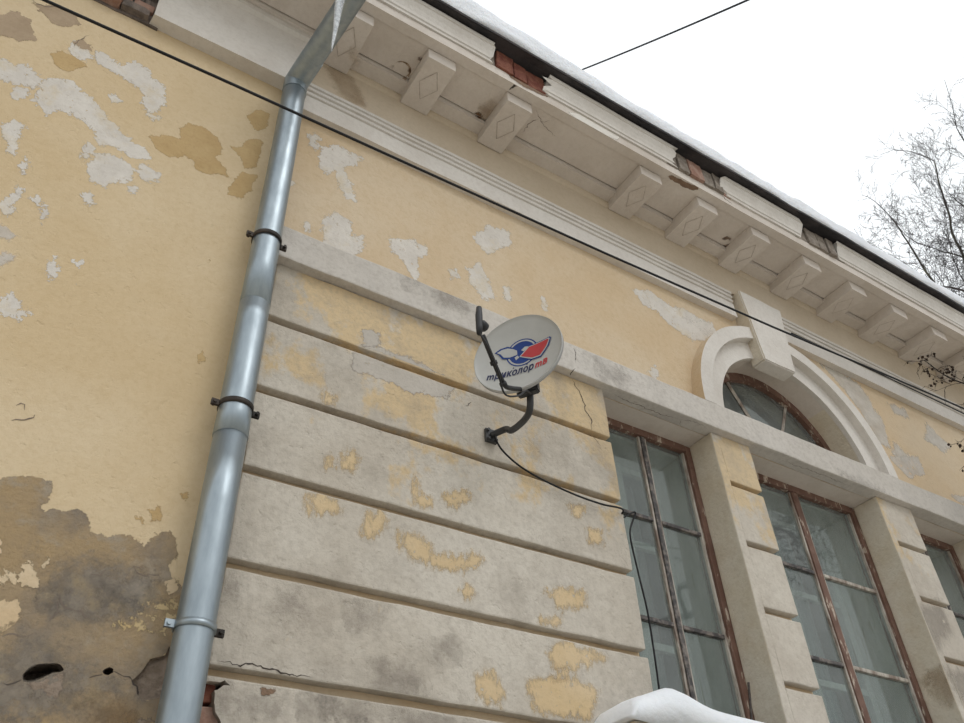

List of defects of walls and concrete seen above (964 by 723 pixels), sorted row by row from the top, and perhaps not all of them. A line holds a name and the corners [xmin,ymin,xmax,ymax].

flaking render [0,2,81,42]
spalling [488,51,548,97]
peeling [0,39,270,207]
peeling [0,119,50,239]
peeling [0,290,34,321]
peeling [633,289,716,342]
peeling [411,477,472,509]
peeling [360,509,485,600]
peeling [0,476,182,723]
flaking render [199,684,218,723]
crack [221,661,309,678]
peeling [526,641,605,721]